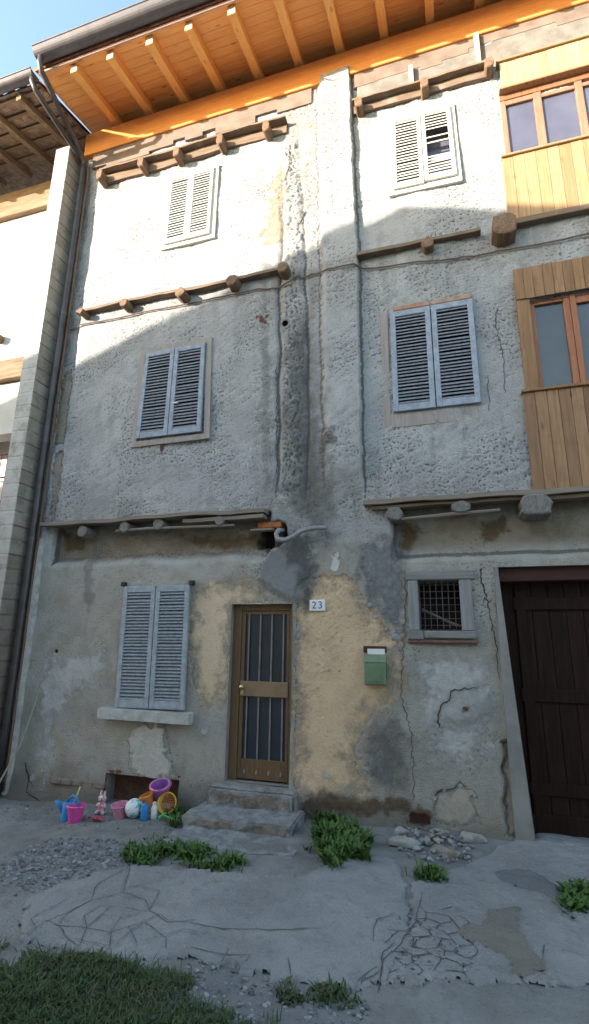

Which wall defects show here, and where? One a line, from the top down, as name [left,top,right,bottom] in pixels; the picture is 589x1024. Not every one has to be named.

leakage [356,523,420,625]
crack [480,568,500,679]
crack [400,570,478,800]
leakage [302,720,410,817]
flaking render [410,784,477,826]
crack [365,906,478,985]